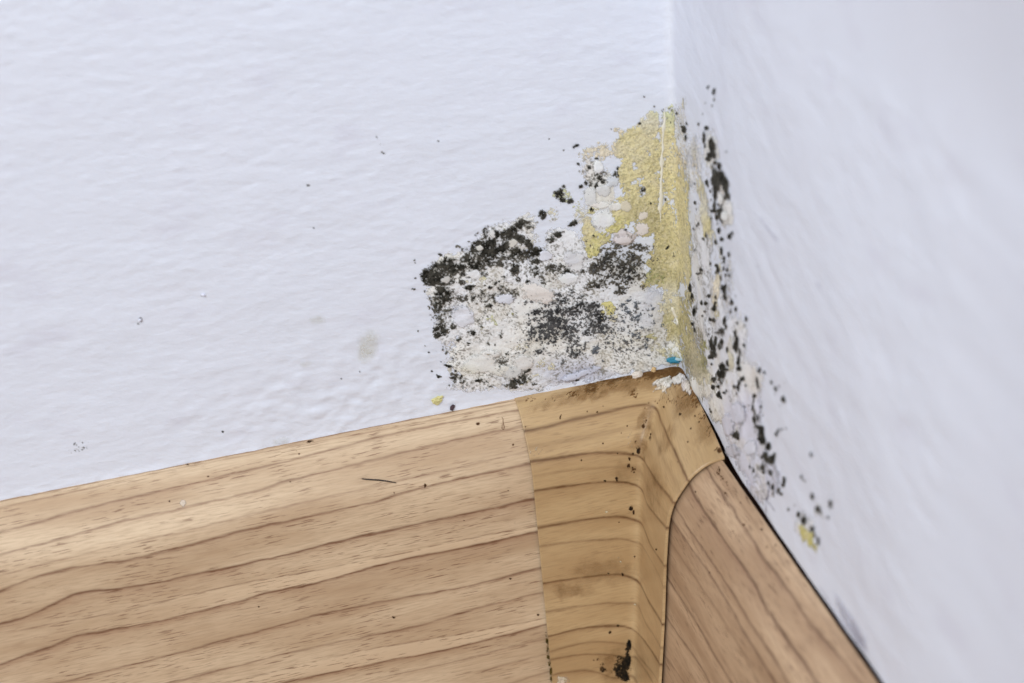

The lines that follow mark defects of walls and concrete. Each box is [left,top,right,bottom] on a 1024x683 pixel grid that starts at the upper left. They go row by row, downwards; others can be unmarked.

leakage [412,86,786,504]
leakage [787,493,832,552]